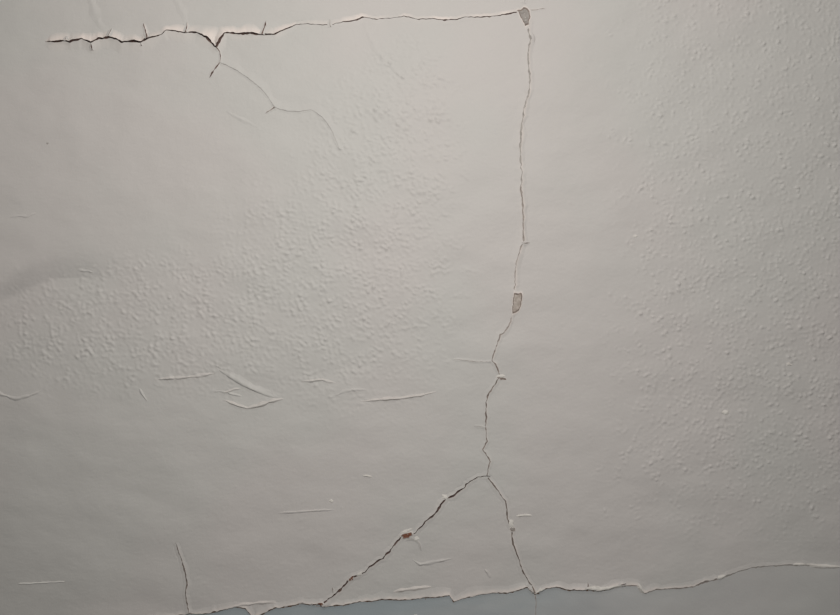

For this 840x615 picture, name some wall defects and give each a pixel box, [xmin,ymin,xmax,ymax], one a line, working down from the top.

crack [45,9,518,150]
crack [148,20,840,615]
peeling [263,566,840,615]